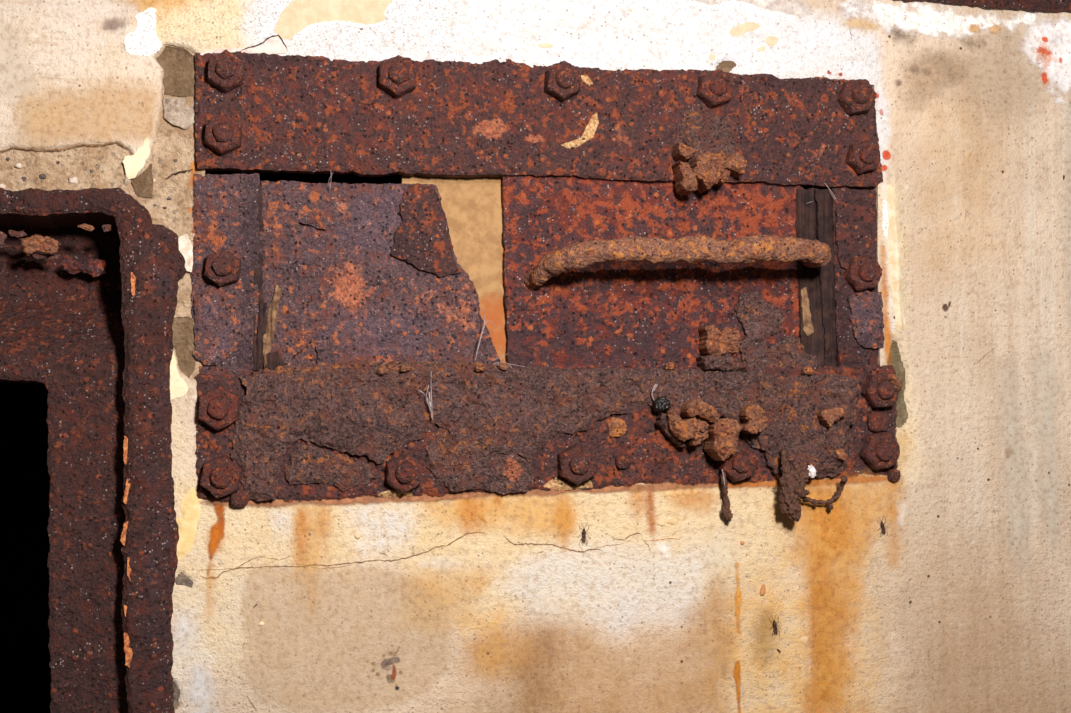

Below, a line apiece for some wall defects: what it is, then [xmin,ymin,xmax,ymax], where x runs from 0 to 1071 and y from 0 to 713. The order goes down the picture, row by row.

spalling [0,0,392,400]
corrosion [0,230,108,277]
corrosion [78,224,111,232]
corrosion [884,313,892,364]
corrosion [205,480,780,559]
crack [202,532,674,579]
corrosion [783,469,901,713]